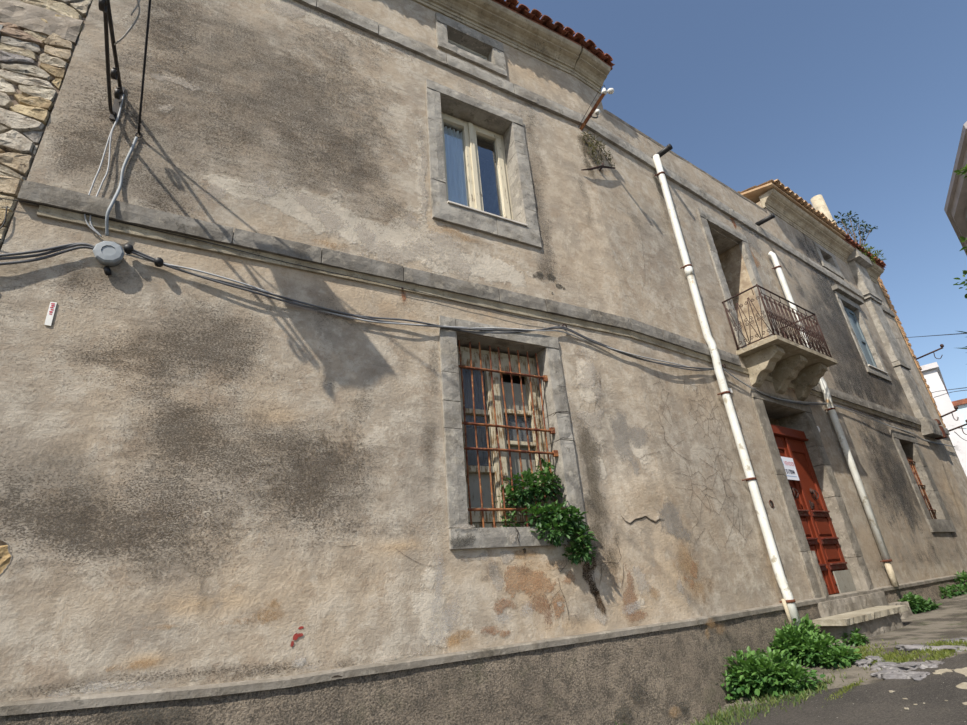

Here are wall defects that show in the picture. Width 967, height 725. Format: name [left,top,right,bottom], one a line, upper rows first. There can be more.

flaking render [477,535,576,637]
leakage [580,431,616,614]
crack [641,372,752,543]